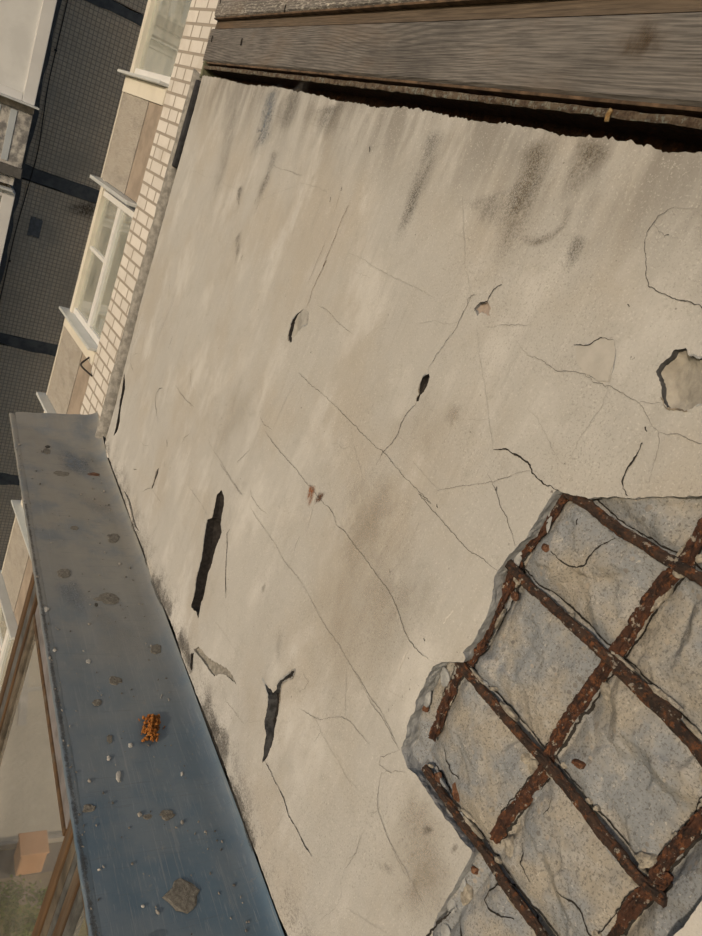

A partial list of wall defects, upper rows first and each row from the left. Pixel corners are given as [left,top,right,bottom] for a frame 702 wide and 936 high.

spalling [288,309,308,342]
spalling [416,374,430,401]
spalling [656,348,702,412]
spalling [191,490,222,617]
spalling [262,668,295,763]
spalling [401,489,702,936]